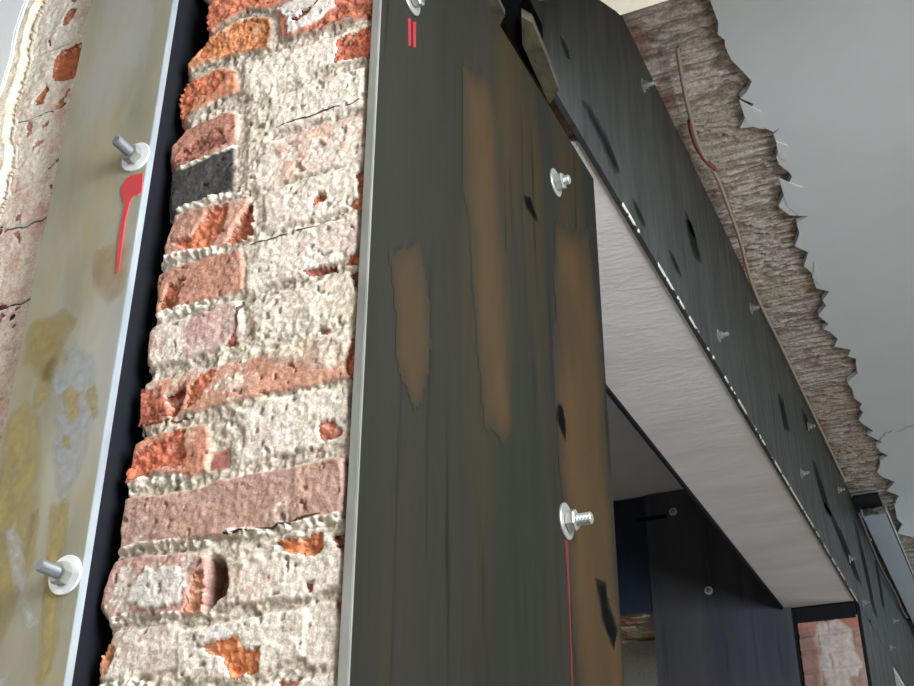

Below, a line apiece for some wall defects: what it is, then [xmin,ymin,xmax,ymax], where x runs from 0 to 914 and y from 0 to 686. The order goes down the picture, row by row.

spalling [63,0,77,26]
spalling [34,43,82,110]
peeling [0,0,49,243]
crack [276,98,362,128]
spalling [622,0,914,626]
crack [223,512,320,535]